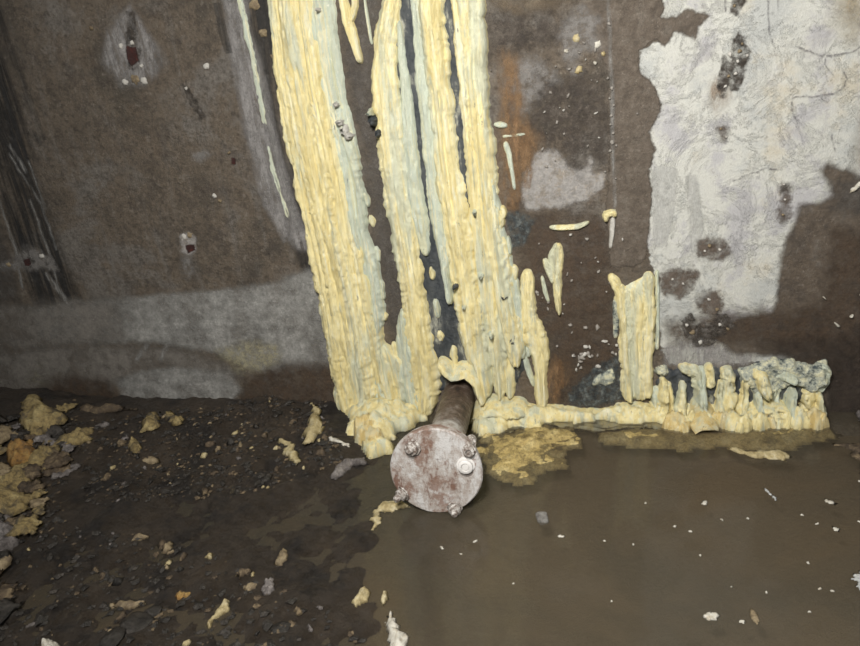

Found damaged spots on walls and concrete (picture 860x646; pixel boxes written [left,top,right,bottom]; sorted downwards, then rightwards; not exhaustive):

water stain [0,0,860,459]
peeling [639,0,860,367]